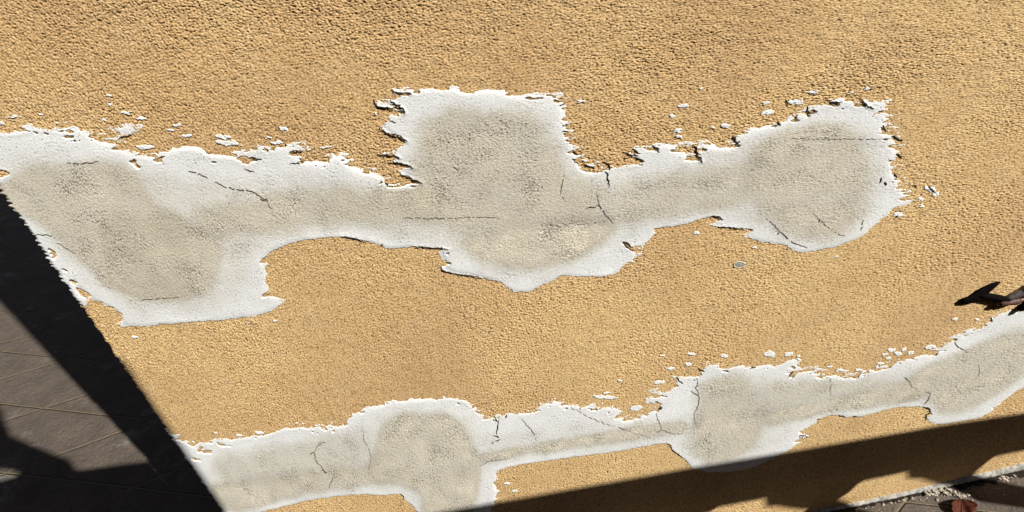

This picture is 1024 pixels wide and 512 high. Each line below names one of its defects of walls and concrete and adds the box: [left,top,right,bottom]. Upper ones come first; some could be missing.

peeling [0,86,939,339]
crack [560,171,614,224]
peeling [165,310,1024,512]